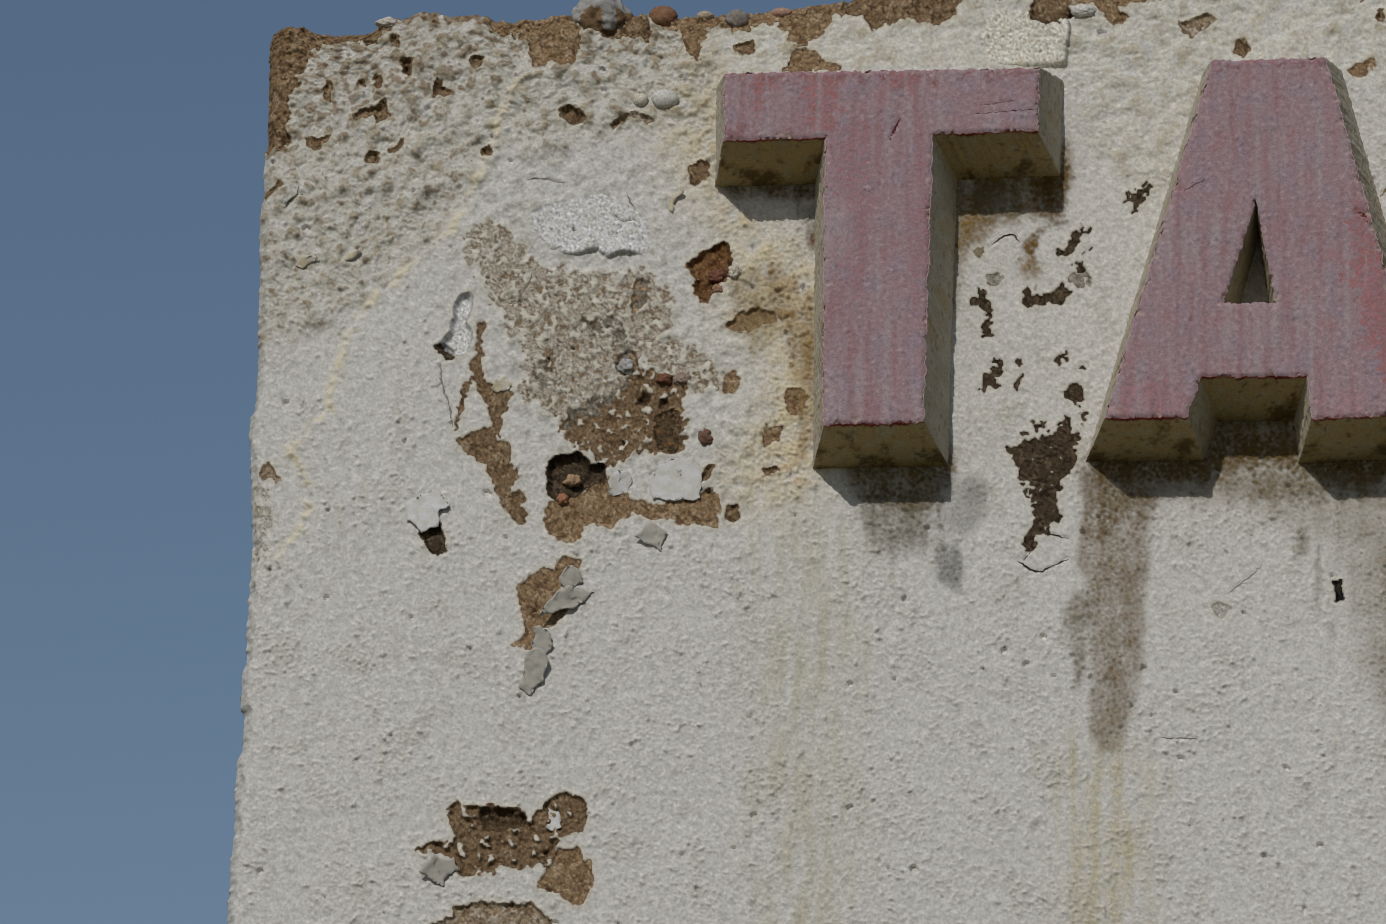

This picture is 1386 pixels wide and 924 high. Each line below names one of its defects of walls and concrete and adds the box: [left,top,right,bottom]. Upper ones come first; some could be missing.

spalling [469,54,484,68]
spalling [489,0,962,72]
spalling [1029,0,1146,25]
spalling [1178,12,1217,38]
peeling [1022,227,1093,308]
peeling [970,272,1004,338]
peeling [978,357,1024,393]
peeling [433,194,741,696]
peeling [1005,350,1089,552]
peeling [405,488,449,556]
leakage [1070,461,1150,743]
spalling [415,792,594,924]